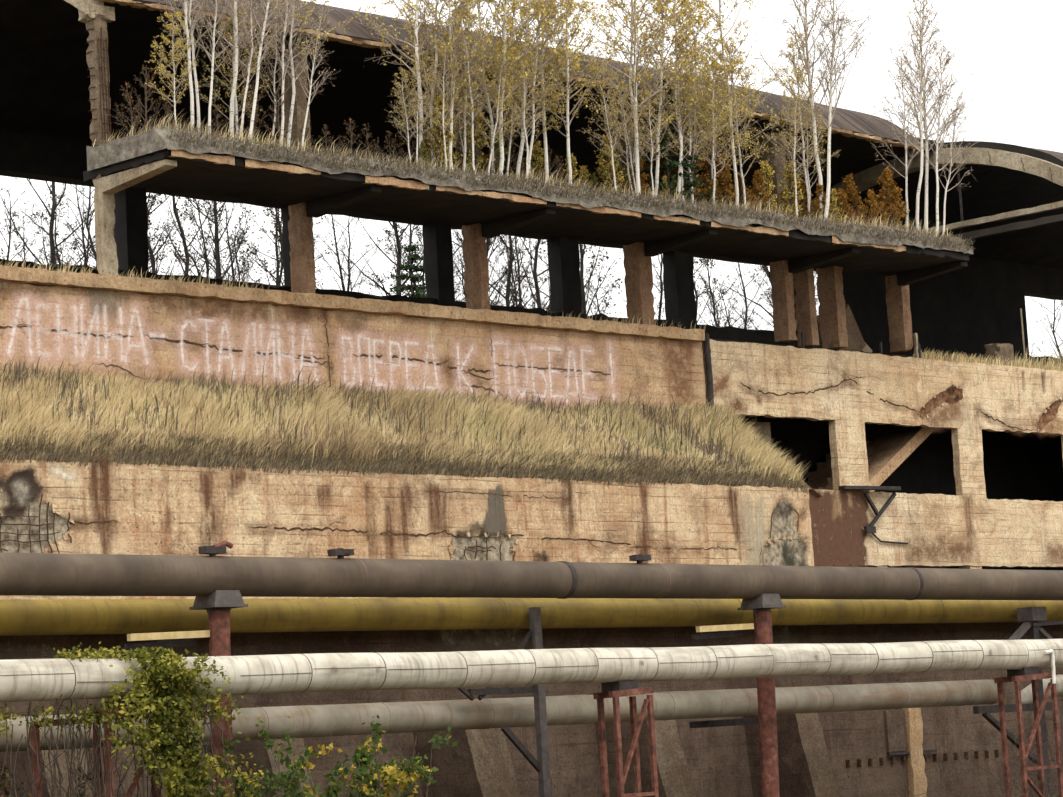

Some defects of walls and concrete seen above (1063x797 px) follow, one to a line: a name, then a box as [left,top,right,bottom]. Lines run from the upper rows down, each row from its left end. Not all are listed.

crack [0,317,612,396]
crack [742,373,917,412]
spalling [917,384,963,418]
crack [979,400,1057,431]
spalling [0,467,75,553]
corrosion [90,457,110,554]
corrosion [201,474,215,546]
crack [251,522,457,537]
corrosion [386,487,410,558]
corrosion [429,484,445,534]
spalling [447,532,519,561]
spalling [763,502,810,566]